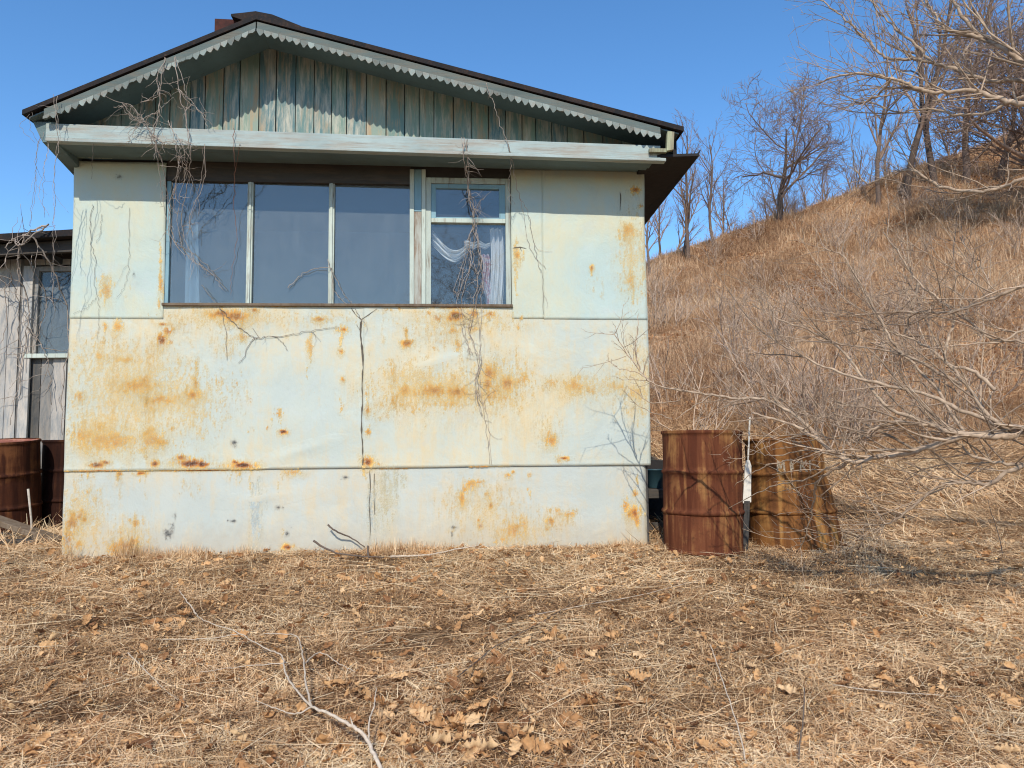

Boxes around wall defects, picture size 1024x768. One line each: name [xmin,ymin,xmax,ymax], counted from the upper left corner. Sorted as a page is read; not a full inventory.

corrosion [204,306,296,342]
corrosion [64,318,261,488]
corrosion [365,327,641,414]
corrosion [62,490,149,555]
corrosion [459,465,528,508]
corrosion [621,475,646,527]